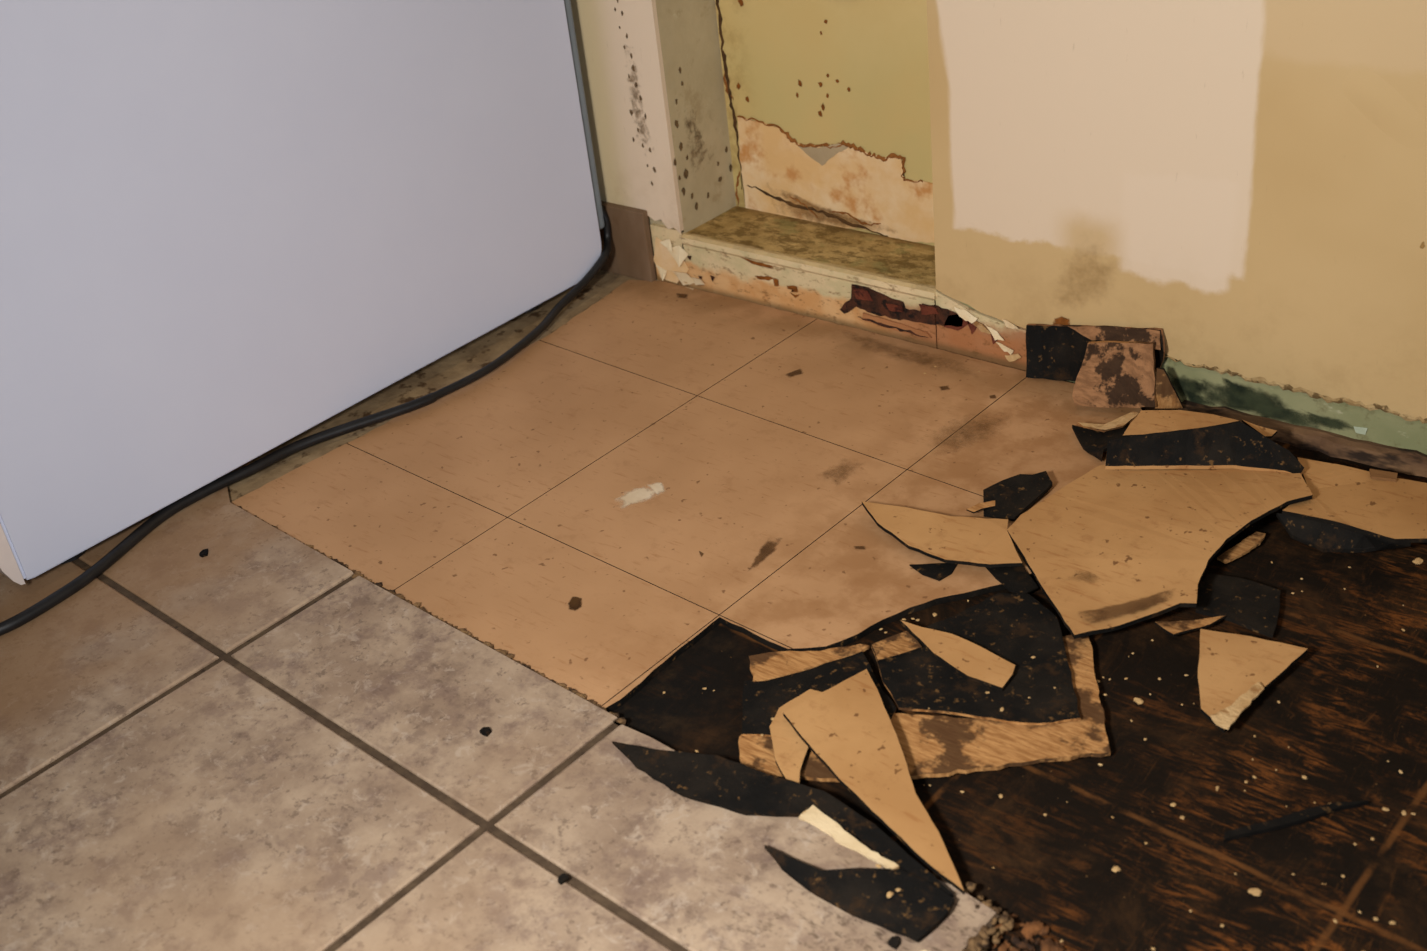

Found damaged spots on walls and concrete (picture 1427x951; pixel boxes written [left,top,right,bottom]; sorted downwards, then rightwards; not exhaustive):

damp [614,0,656,186]
damp [674,67,732,210]
flaking render [737,116,935,243]
peeling [654,237,715,290]
spalling [839,284,1021,362]
damp [1172,377,1349,429]
flaking render [799,805,899,870]
spalling [932,871,1014,951]